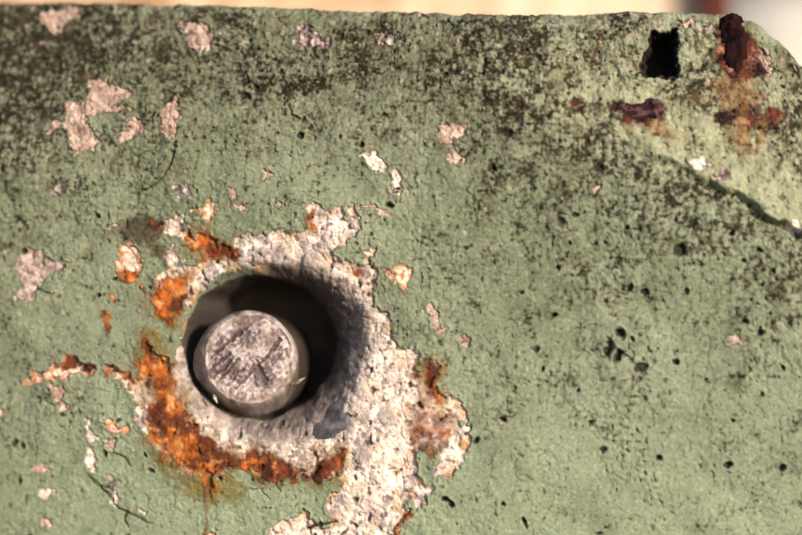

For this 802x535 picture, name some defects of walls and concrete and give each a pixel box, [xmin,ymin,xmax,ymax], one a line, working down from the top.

peeling [40,6,83,35]
peeling [178,18,213,55]
corrosion [715,25,787,153]
peeling [27,75,144,157]
peeling [438,122,468,164]
peeling [359,151,403,195]
corrosion [185,229,238,263]
corrosion [119,270,192,327]
corrosion [55,355,96,375]
spalling [14,198,472,535]
corrosion [105,333,348,509]
crack [88,475,149,526]